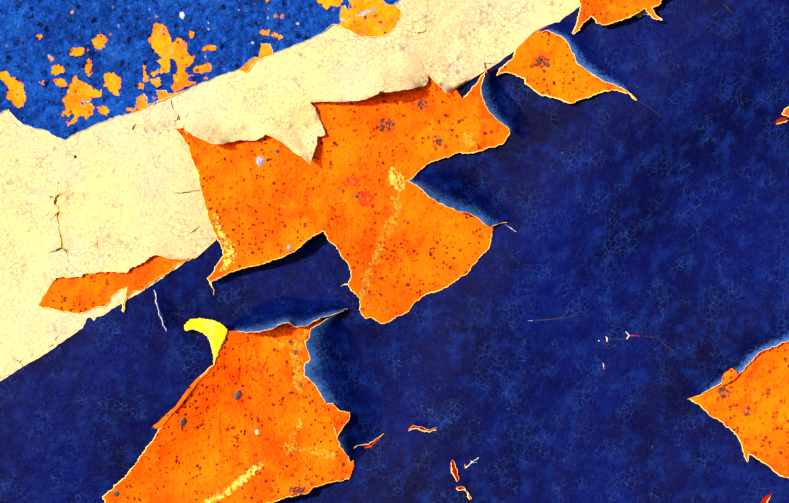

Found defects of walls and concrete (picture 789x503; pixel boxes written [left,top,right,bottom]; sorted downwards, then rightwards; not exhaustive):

peeling [0,71,26,108]
crack [49,182,74,257]
peeling [38,0,663,503]
peeling [684,312,789,478]